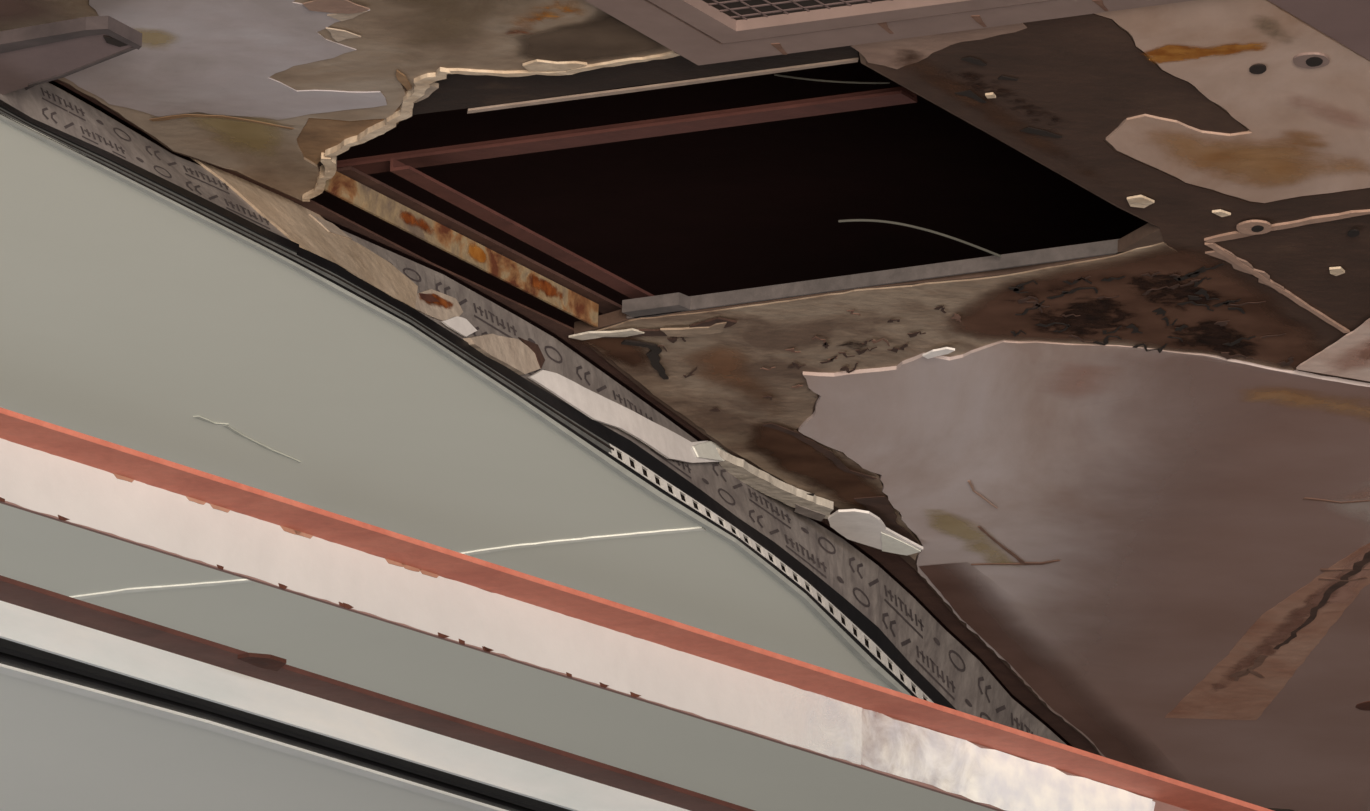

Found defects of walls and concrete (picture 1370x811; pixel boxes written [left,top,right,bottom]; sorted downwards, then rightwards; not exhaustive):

peeling [303,0,370,42]
peeling [866,14,1370,351]
leakage [1165,136,1362,184]
peeling [309,214,352,239]
rust [401,212,431,232]
rust [532,276,562,299]
peeling [922,347,955,359]
crack [193,416,301,463]
peeling [527,370,730,463]
peeling [828,509,923,555]
leakage [919,250,1370,811]
crack [1229,551,1370,681]